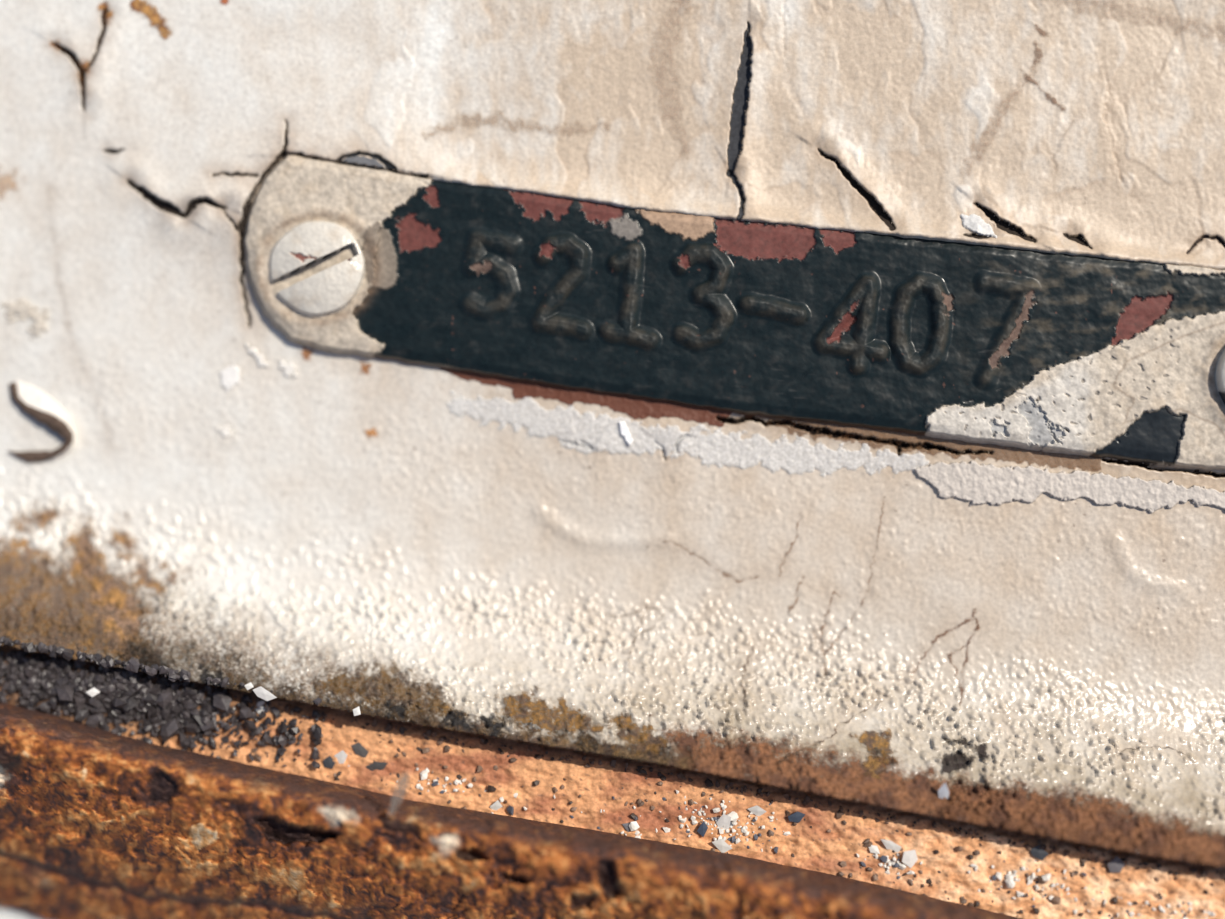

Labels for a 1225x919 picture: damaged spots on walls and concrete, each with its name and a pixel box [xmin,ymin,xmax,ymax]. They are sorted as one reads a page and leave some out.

crack [52,9,108,112]
corrosion [98,2,113,22]
corrosion [130,0,171,39]
crack [103,147,124,155]
crack [127,120,429,328]
crack [727,22,752,220]
crack [818,148,896,231]
crack [964,202,1093,249]
peeling [7,380,75,463]
spalling [440,368,1225,513]
corrosion [0,508,1225,866]
corrosion [0,702,1022,919]